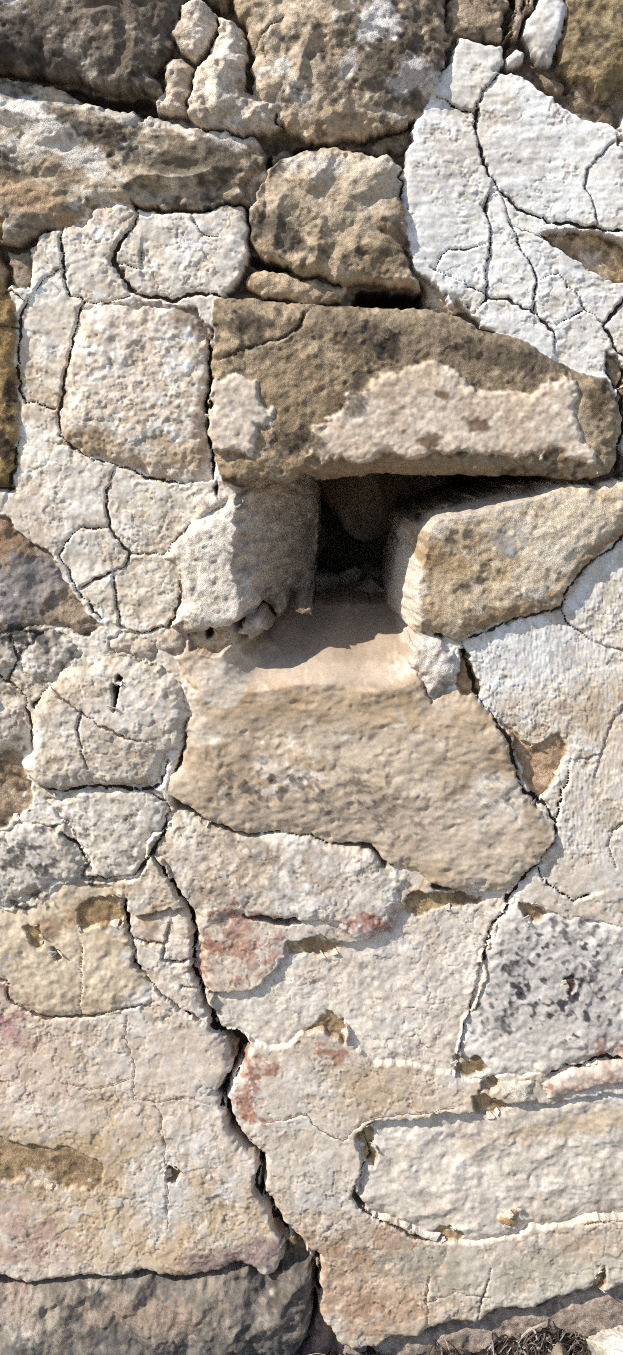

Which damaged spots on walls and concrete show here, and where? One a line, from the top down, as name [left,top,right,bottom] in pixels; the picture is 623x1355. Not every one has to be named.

crack [433,0,623,477]
spalling [540,226,623,283]
crack [3,206,309,633]
spalling [504,725,568,807]
crack [458,533,623,1052]
crack [0,630,454,1241]
spalling [519,902,548,924]
spalling [560,976,577,996]
crack [550,1053,623,1073]
spalling [0,1136,105,1193]
crack [303,1250,322,1341]